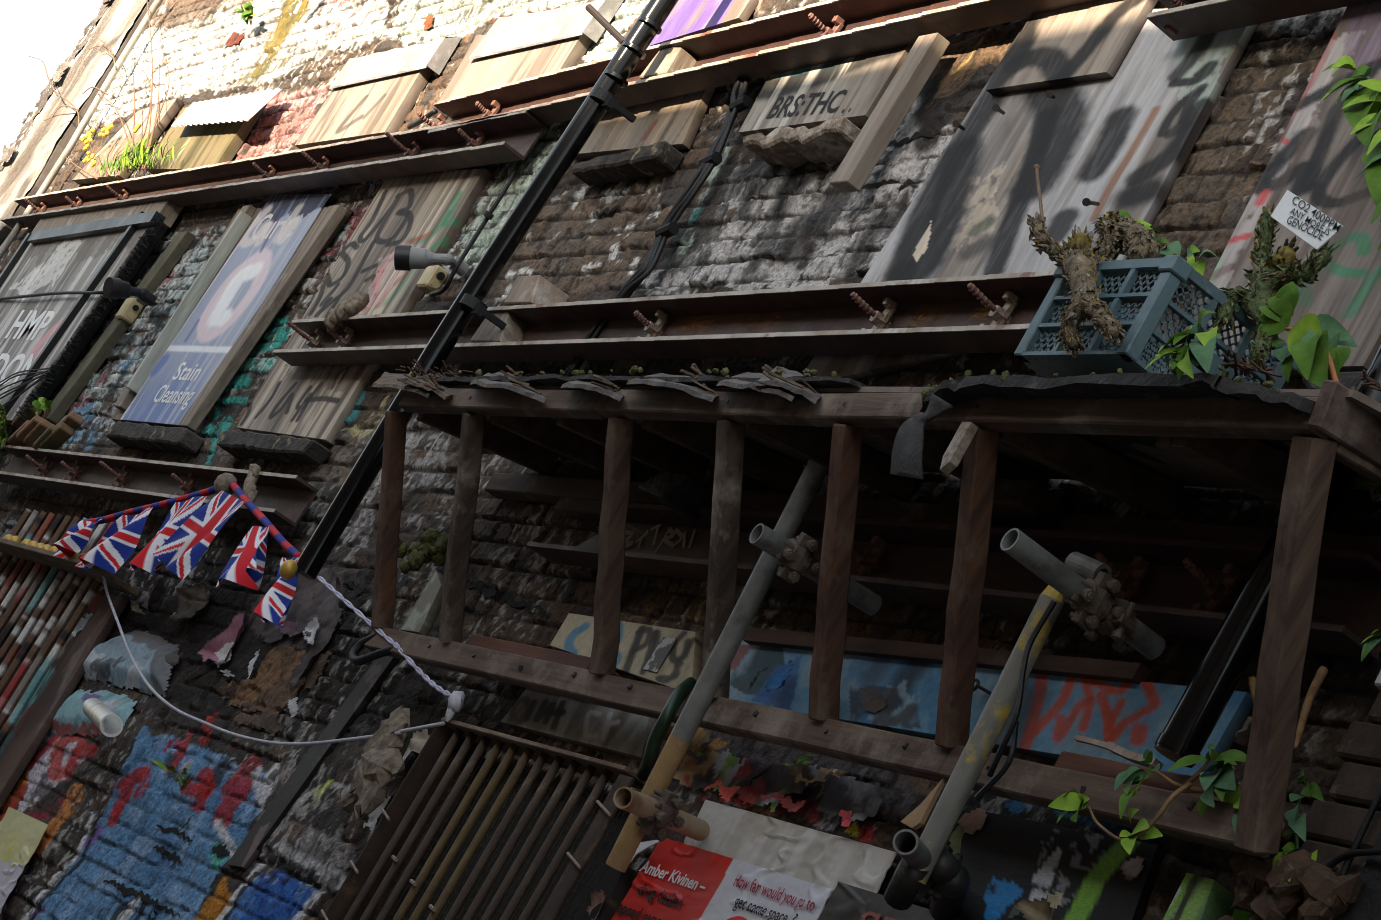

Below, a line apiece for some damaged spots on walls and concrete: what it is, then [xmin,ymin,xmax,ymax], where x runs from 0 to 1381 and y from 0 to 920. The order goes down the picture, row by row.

spalling [195,567,344,737]
peeling [673,727,883,827]